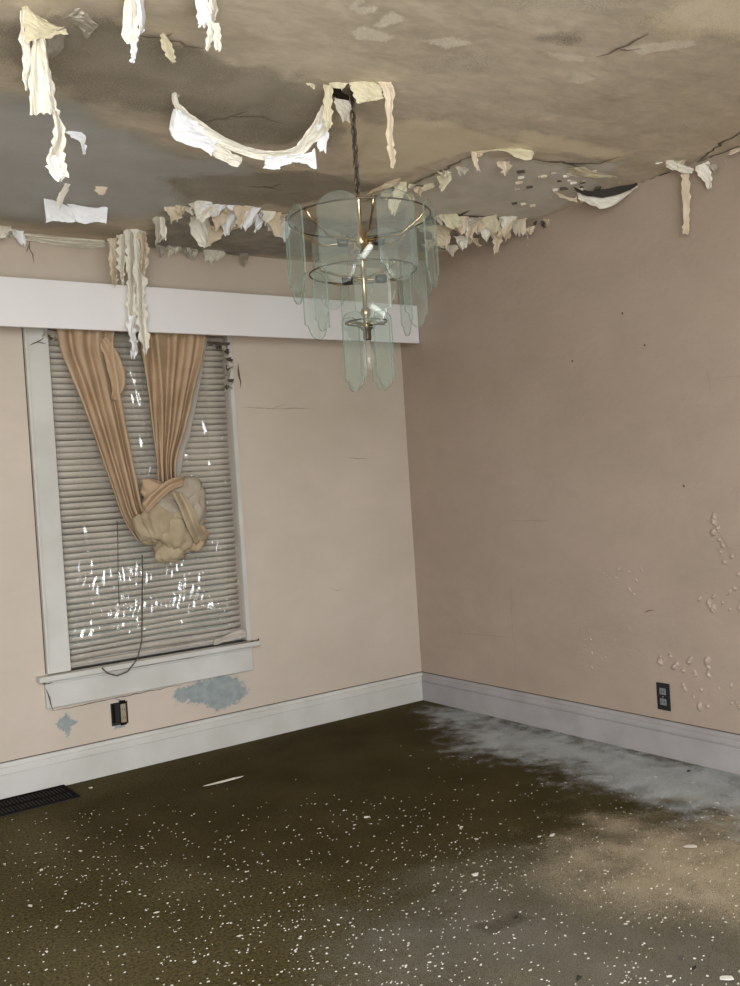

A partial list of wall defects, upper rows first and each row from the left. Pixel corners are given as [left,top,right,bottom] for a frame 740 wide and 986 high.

peeling [121,0,146,63]
crack [597,34,648,57]
peeling [18,6,108,224]
damp [0,7,382,229]
peeling [655,147,740,235]
peeling [54,712,78,737]
peeling [172,675,250,712]